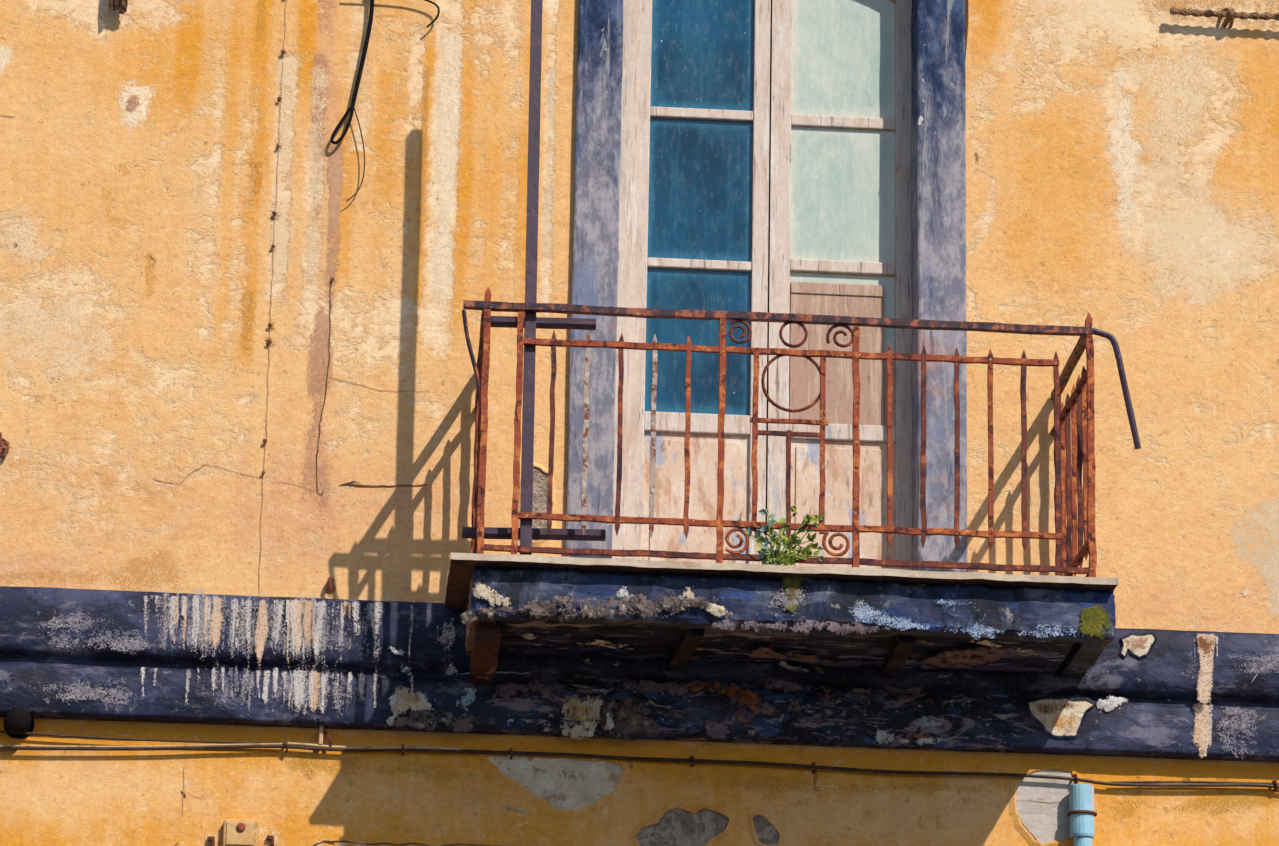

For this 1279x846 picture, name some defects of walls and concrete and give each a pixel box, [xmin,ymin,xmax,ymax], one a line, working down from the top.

damp [240,291,257,360]
crack [153,3,429,596]
damp [248,52,343,532]
damp [0,541,381,714]
crack [312,838,501,846]
spalling [386,646,496,734]
flaking render [475,695,659,821]
flaking render [629,802,785,846]
spalling [460,584,1077,715]
spalling [1008,762,1083,846]
damp [1190,633,1218,758]